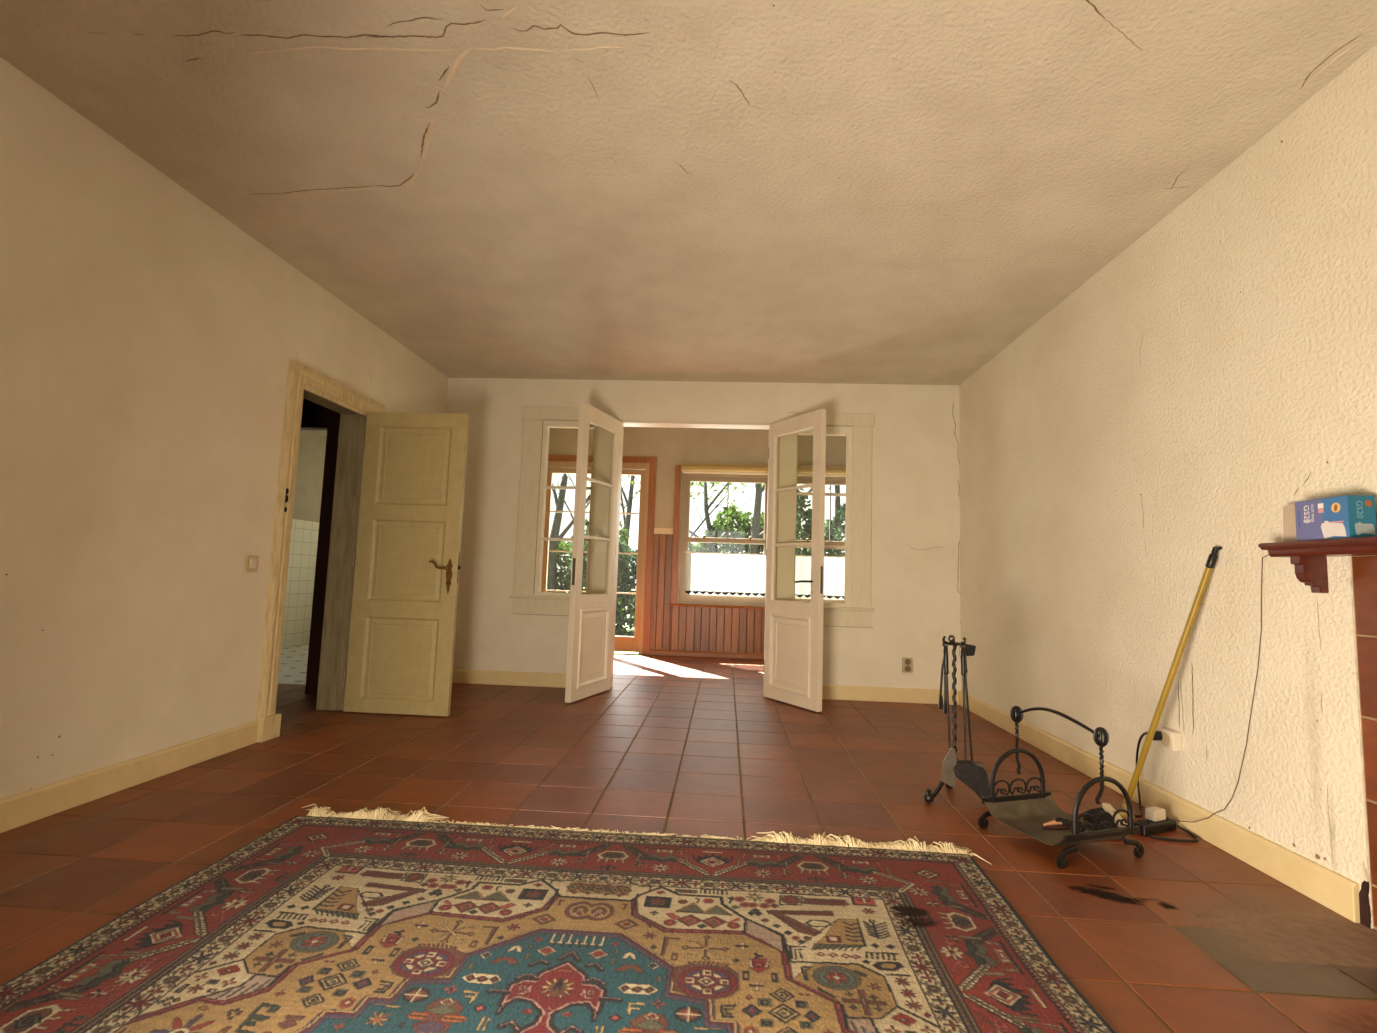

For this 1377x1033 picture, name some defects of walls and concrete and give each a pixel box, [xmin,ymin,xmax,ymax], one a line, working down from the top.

crack [89,5,652,197]
crack [1086,0,1142,51]